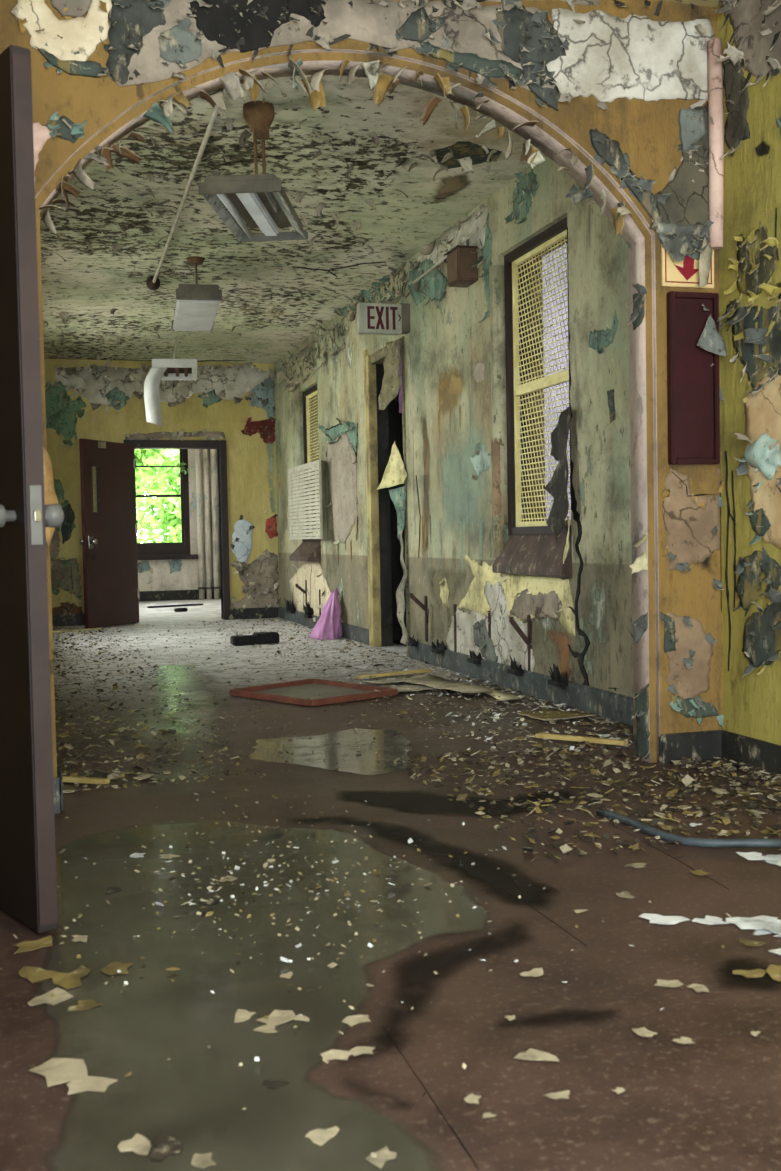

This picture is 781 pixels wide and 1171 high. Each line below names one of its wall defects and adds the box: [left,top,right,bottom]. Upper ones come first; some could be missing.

flaking render [11,0,781,287]
flaking render [40,204,493,446]
peeling [589,283,648,354]
peeling [43,447,84,625]
peeling [229,514,331,622]
flaking render [319,418,359,544]
peeling [377,441,408,645]
peeling [544,407,571,564]
peeling [607,389,616,424]
peeling [629,533,648,574]
flaking render [436,555,621,767]
flaking render [626,612,724,727]